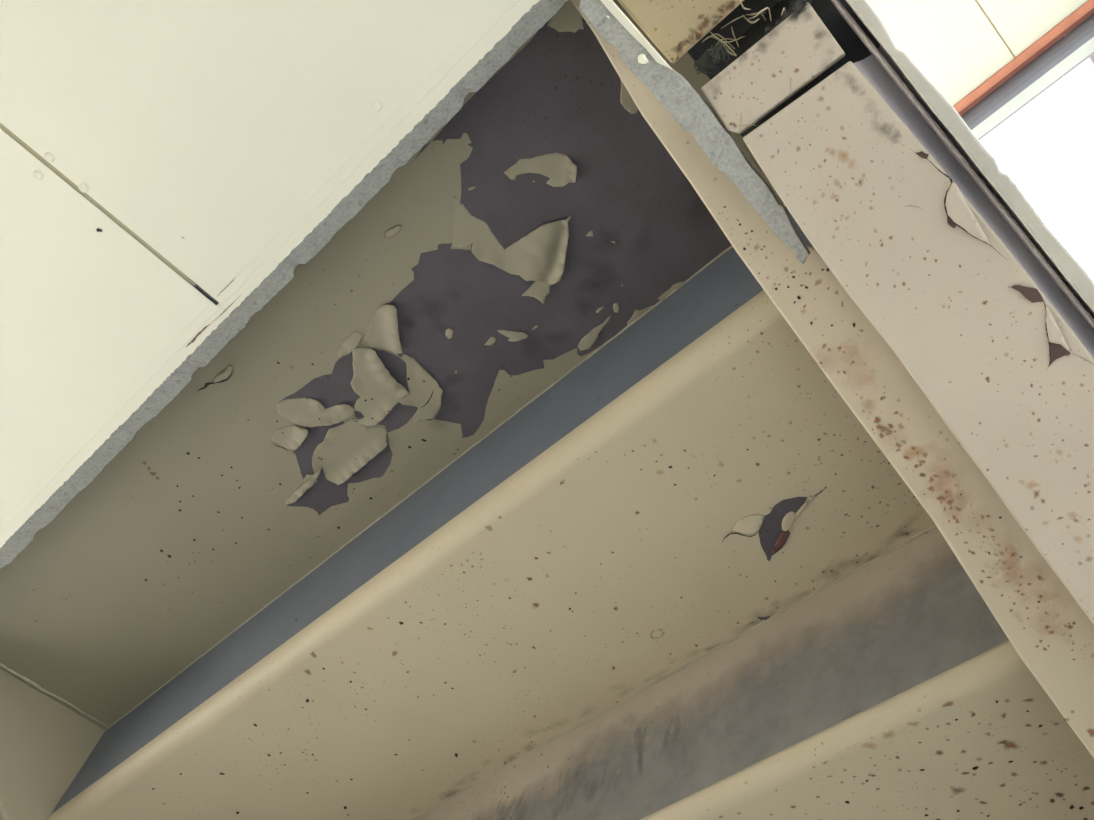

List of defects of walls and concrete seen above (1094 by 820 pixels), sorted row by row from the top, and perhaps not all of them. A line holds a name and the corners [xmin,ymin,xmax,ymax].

peeling [0,0,825,569]
corrosion [875,411,975,554]
corrosion [981,516,1075,651]